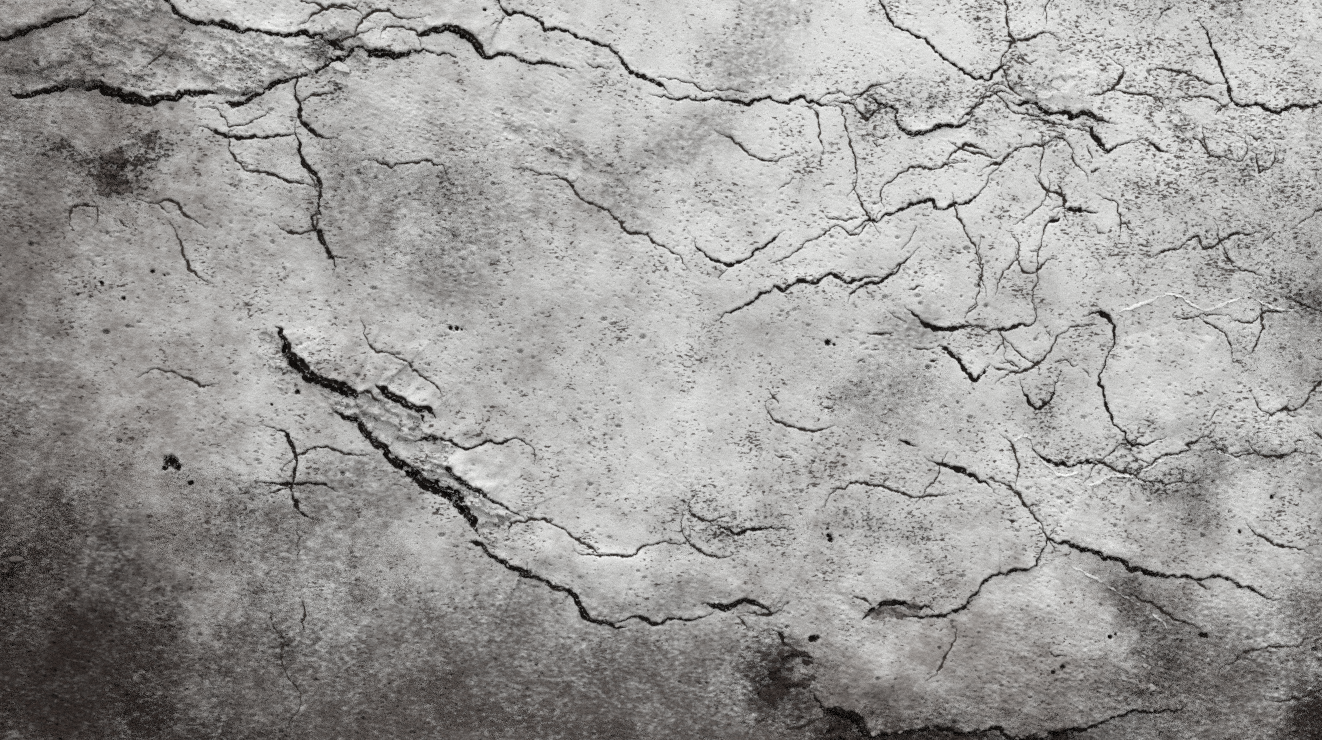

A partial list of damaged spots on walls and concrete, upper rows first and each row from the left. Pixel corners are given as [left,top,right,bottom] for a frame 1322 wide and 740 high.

spalling [4,0,371,102]
crack [0,0,606,284]
crack [137,368,219,388]
spalling [257,336,508,545]
crack [262,322,793,648]
crack [493,0,1322,680]
crack [750,690,1183,740]